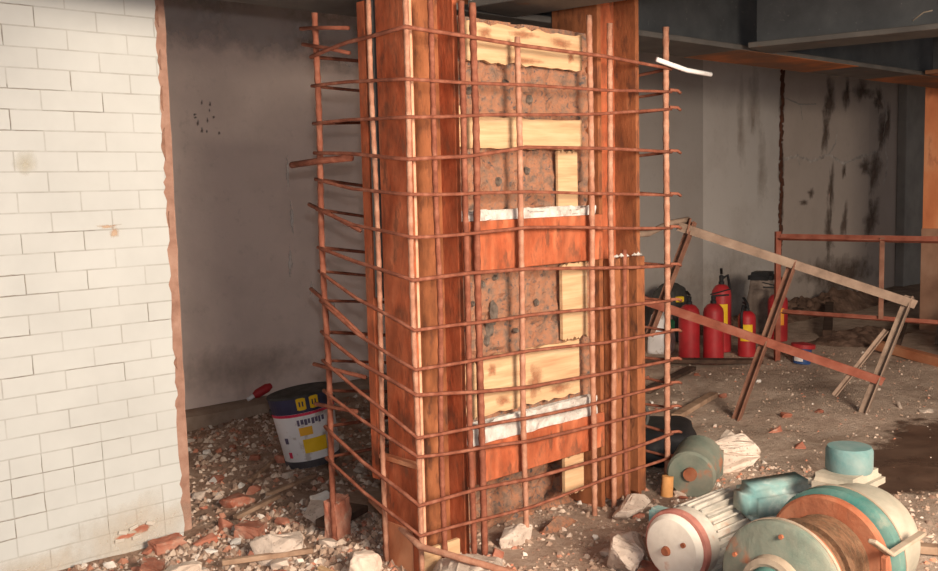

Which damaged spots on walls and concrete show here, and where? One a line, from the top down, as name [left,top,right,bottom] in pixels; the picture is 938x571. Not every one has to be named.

damp [822,83,890,146]
damp [826,166,846,247]
spalling [115,521,155,543]